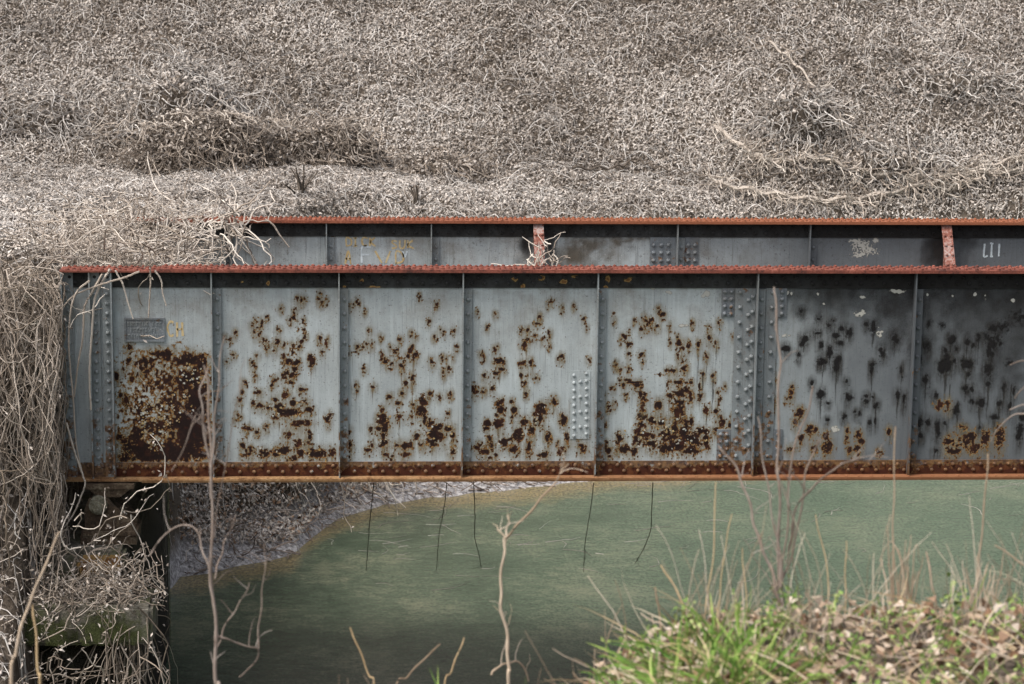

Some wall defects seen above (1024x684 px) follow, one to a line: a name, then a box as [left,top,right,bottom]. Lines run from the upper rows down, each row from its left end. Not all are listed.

corrosion [102,279,1024,477]